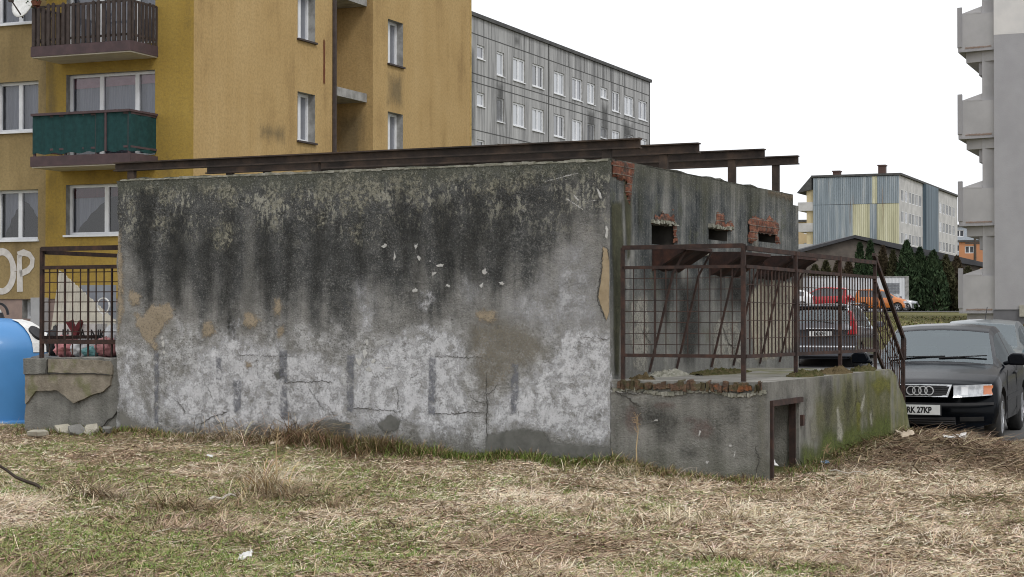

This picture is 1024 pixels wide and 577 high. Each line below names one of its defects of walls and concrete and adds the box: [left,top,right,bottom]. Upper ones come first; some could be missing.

flaking render [611,160,635,204]
flaking render [748,215,780,244]
flaking render [118,233,173,350]
peeling [517,247,609,329]
peeling [23,358,114,404]
crack [177,387,228,430]
crack [435,355,496,436]
damp [811,383,872,440]